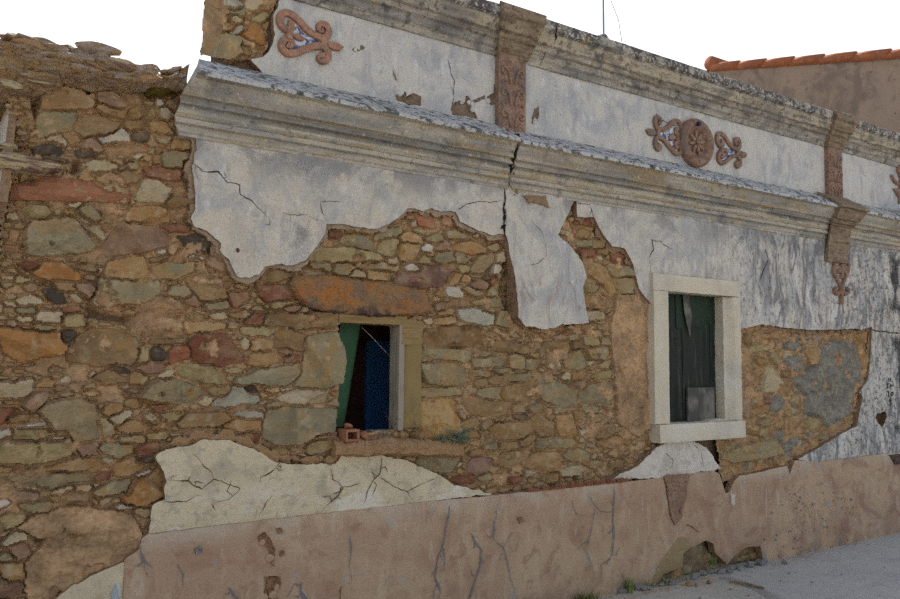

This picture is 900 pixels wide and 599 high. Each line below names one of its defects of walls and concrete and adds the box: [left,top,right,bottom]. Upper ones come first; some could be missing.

spalling [451,89,494,119]
crack [458,133,520,241]
spalling [575,217,648,303]
spalling [715,325,871,482]
spalling [164,429,338,465]
crack [165,451,240,509]
crack [321,460,437,513]
spalling [664,474,690,525]
crack [431,505,450,599]
crack [469,508,515,599]
spalling [652,537,757,585]